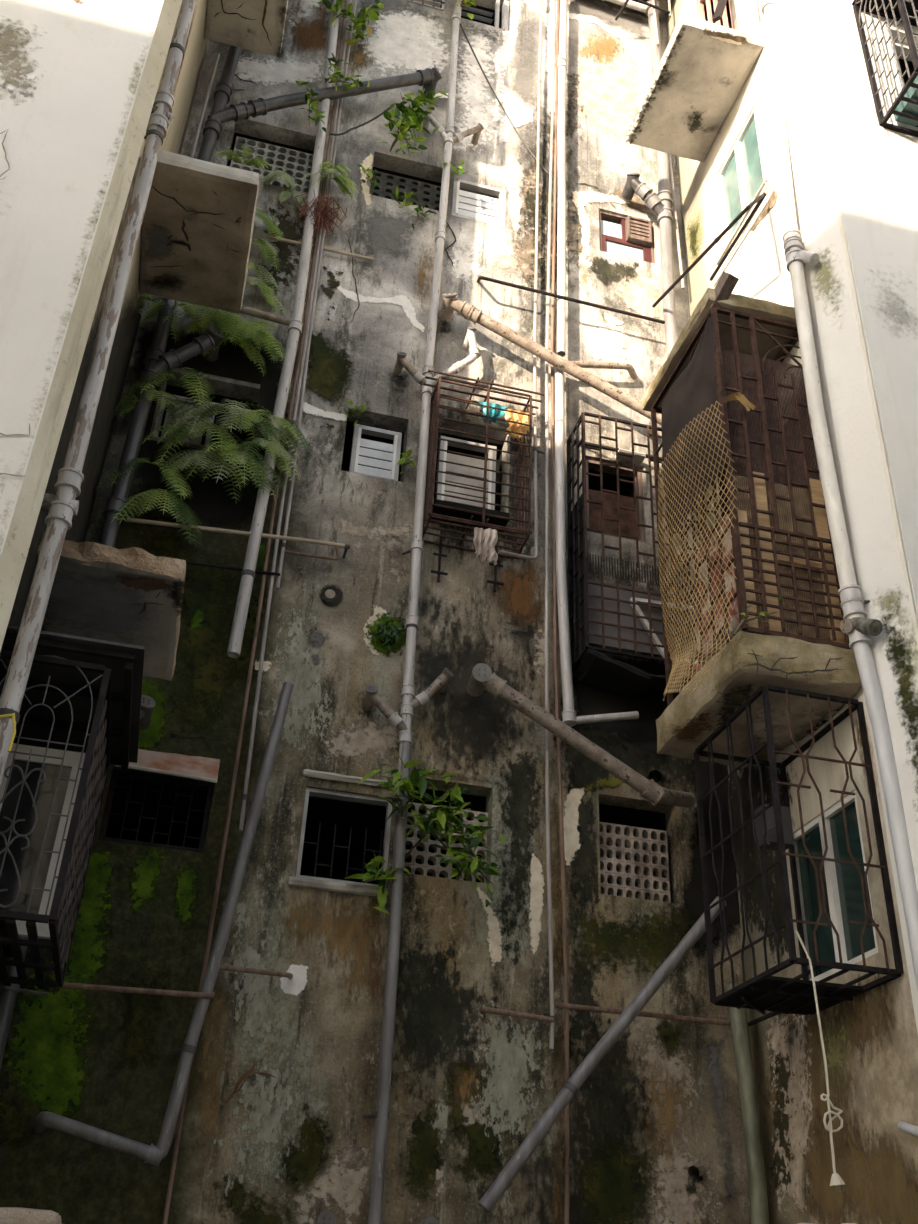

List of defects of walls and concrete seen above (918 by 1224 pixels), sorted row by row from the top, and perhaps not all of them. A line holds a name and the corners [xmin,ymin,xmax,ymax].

damp [0,19,36,98]
crack [214,0,272,46]
damp [625,27,686,144]
damp [688,106,715,133]
crack [152,186,238,267]
spalling [610,188,653,215]
damp [882,614,918,793]
damp [416,590,551,981]
peeling [563,775,625,866]
damp [553,657,797,961]
damp [382,941,683,1224]